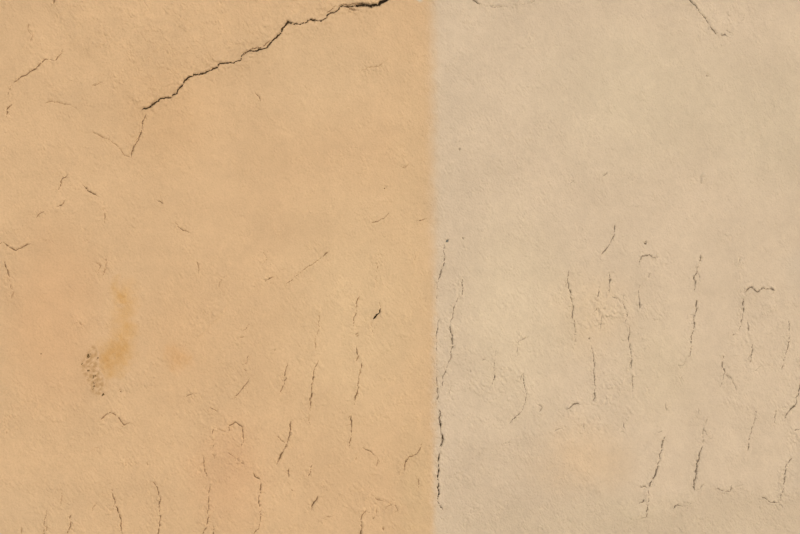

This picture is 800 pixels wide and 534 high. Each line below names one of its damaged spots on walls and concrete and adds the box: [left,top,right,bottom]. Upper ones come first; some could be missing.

crack [91,0,388,157]
crack [351,297,381,337]
crack [593,252,658,391]
crack [676,255,701,382]
crack [733,284,775,372]
crack [203,407,261,534]
crack [273,421,312,491]
crack [347,347,378,466]
crack [554,348,596,432]
crack [640,431,665,517]
crack [673,409,732,512]
crack [748,387,800,449]